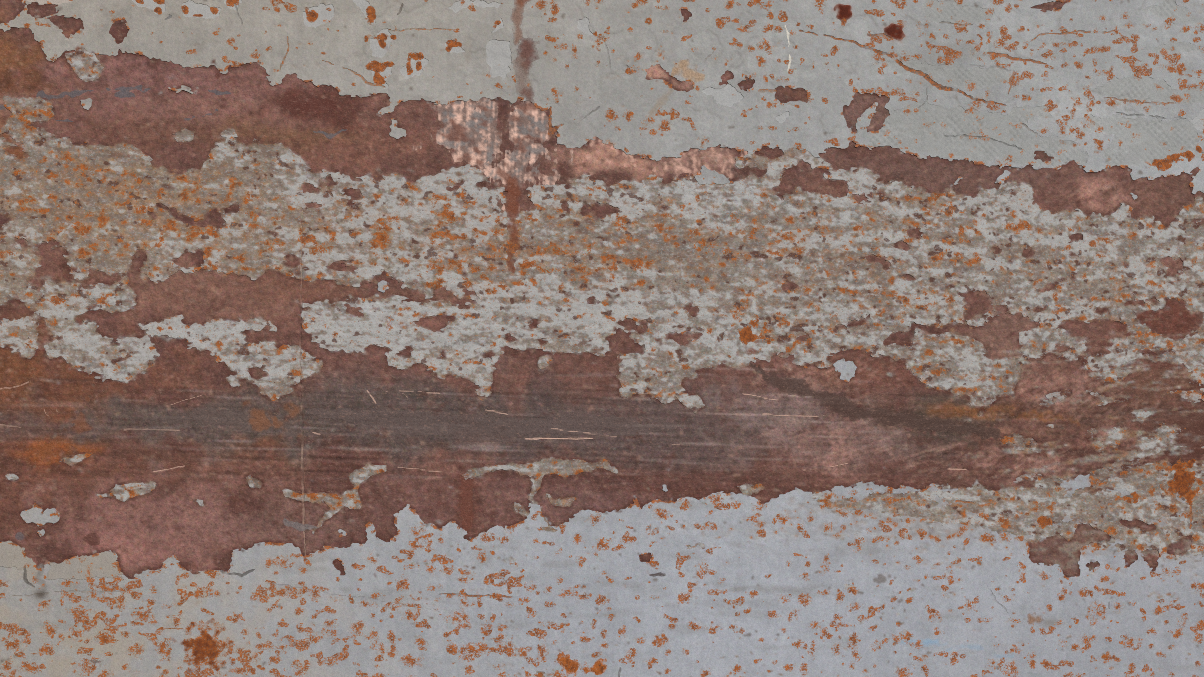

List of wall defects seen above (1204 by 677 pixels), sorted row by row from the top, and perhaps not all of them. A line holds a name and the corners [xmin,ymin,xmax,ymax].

peeling [0,0,84,39]
peeling [109,19,129,44]
peeling [303,3,334,28]
peeling [448,0,512,80]
rust [510,0,540,106]
rust [813,0,852,23]
rust [1149,134,1204,171]
peeling [0,27,1204,414]
peeling [0,299,1204,579]
rust [1160,457,1204,529]
rust [128,615,257,677]
rust [446,621,607,677]